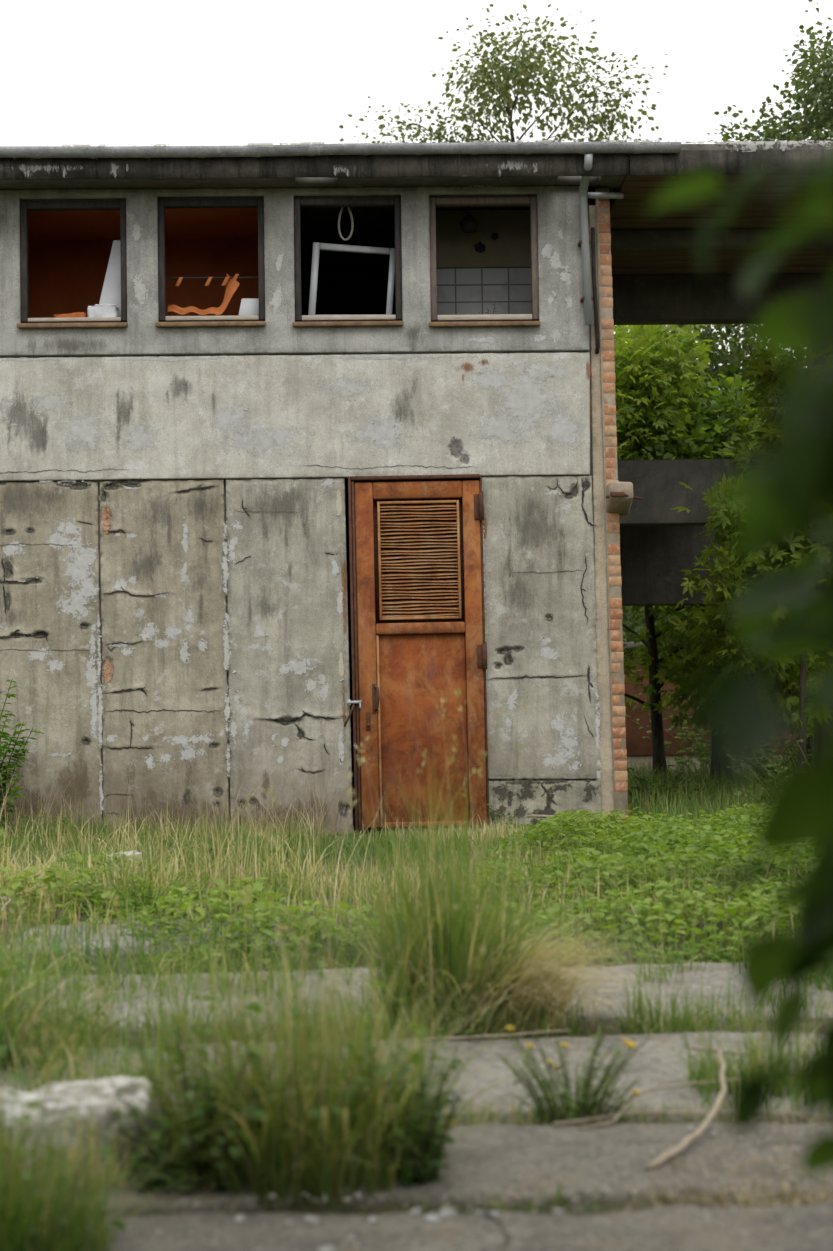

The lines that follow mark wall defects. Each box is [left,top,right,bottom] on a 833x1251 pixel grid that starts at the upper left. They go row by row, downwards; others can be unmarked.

damp [11,404,46,448]
crack [0,468,145,497]
crack [176,484,302,517]
peeling [0,529,42,609]
crack [0,521,141,651]
crack [103,587,168,597]
peeling [1,632,65,673]
peeling [39,480,251,814]
peeling [278,652,344,701]
peeling [271,717,303,764]
crack [266,711,342,773]
peeling [542,687,601,781]